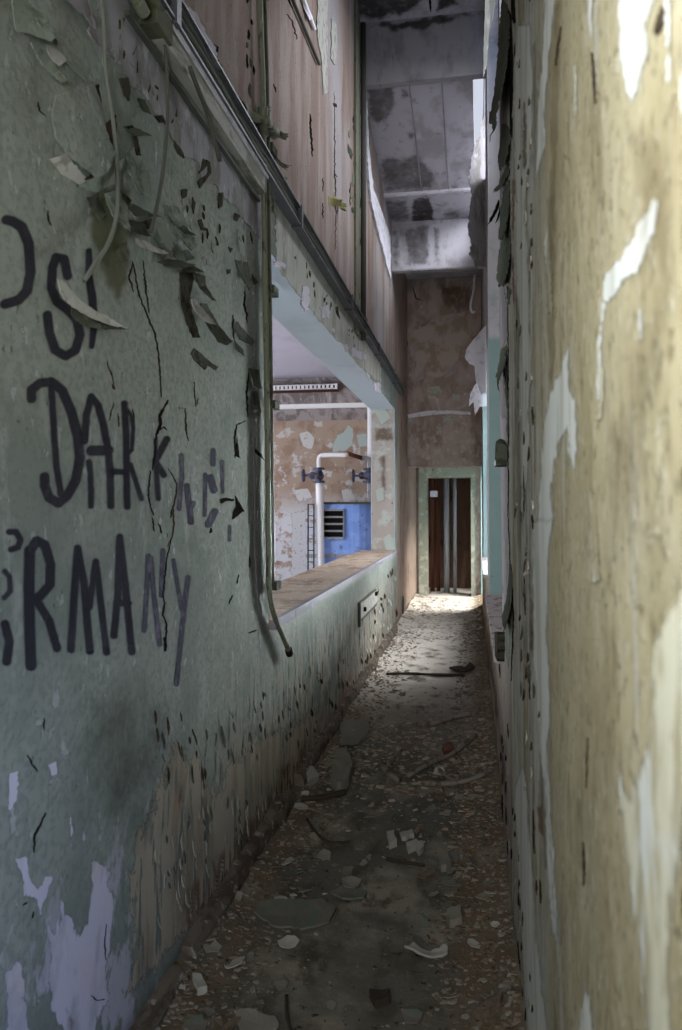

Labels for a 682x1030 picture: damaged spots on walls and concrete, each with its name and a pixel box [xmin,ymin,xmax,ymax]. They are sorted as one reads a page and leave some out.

flaking render [49,0,381,383]
leakage [368,89,408,121]
leakage [358,0,465,32]
leakage [383,156,455,263]
peeling [596,198,658,419]
peeling [618,0,682,112]
crack [107,261,198,651]
peeling [290,488,312,577]
peeling [409,0,577,1030]
flaking render [15,587,398,1030]
peeling [618,589,682,1030]
peeling [4,961,30,1030]